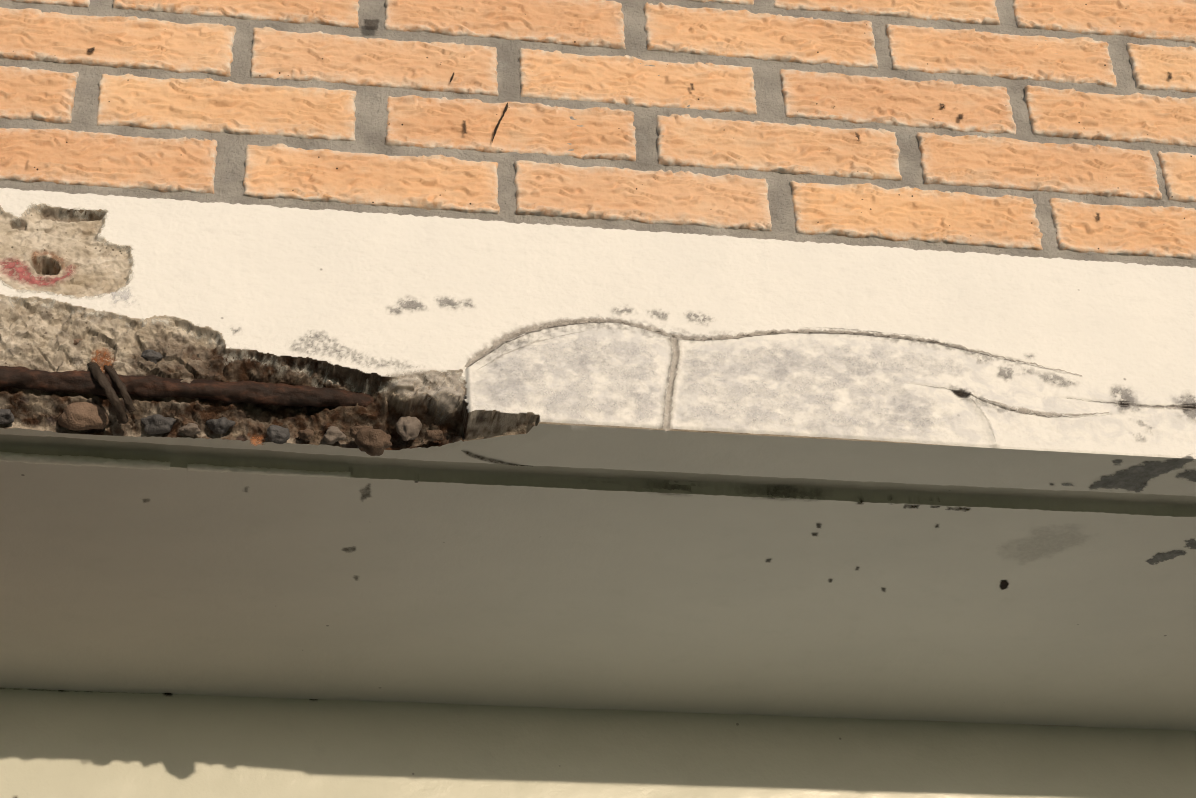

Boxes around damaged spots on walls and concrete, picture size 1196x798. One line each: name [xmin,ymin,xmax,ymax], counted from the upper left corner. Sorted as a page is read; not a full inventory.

spalling [0,203,540,456]
crack [465,318,1196,431]
peeling [1089,456,1196,492]
peeling [1146,539,1196,565]